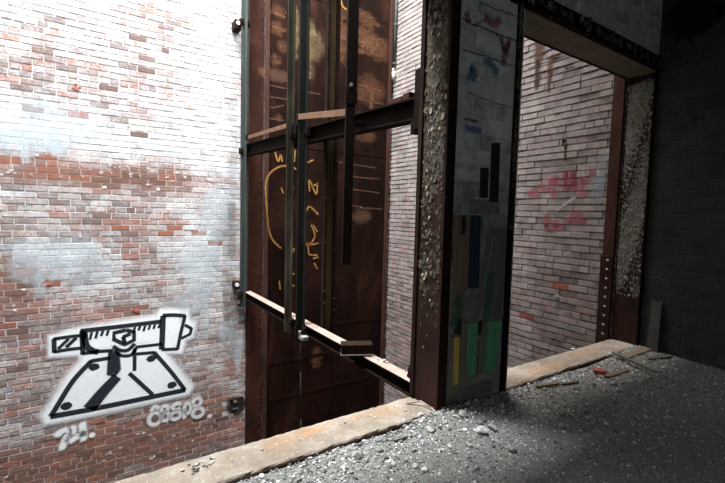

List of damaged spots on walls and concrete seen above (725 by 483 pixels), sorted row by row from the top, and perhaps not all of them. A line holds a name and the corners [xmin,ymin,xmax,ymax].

crack [463,2,574,70]